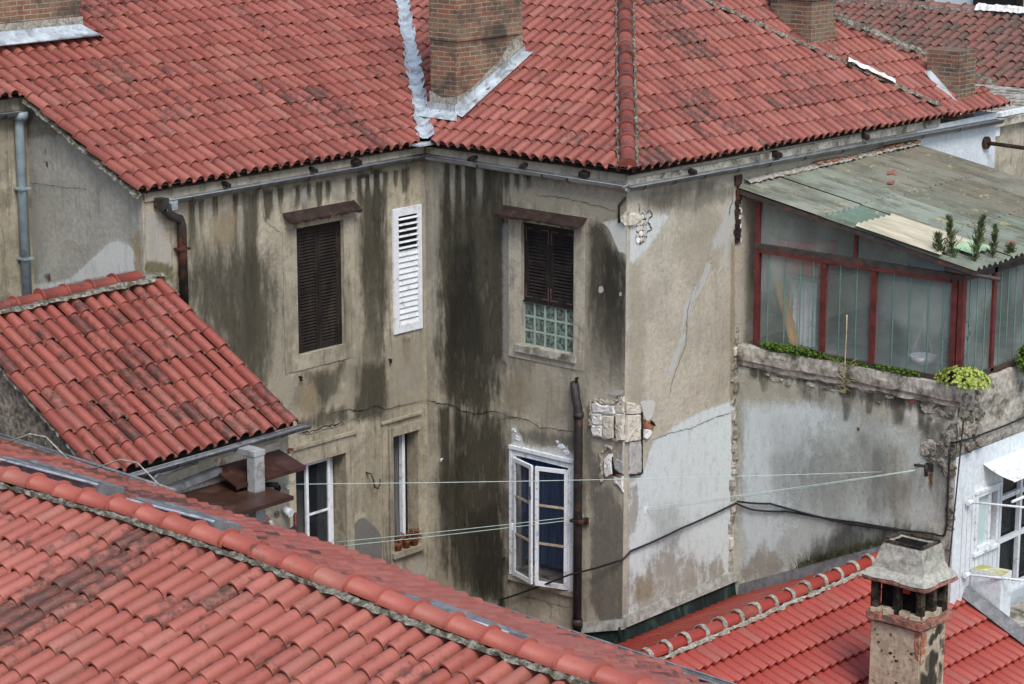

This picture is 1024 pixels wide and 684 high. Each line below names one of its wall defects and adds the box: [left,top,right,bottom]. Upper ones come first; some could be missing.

peeling [603,211,668,264]
leakage [188,168,408,405]
leakage [302,364,386,425]
crack [299,399,573,434]
leakage [434,163,626,621]
leakage [750,368,807,381]
leakage [824,383,946,412]
spalling [588,390,656,533]
spalling [907,386,987,531]
peeling [623,372,782,616]
leakage [806,527,897,566]